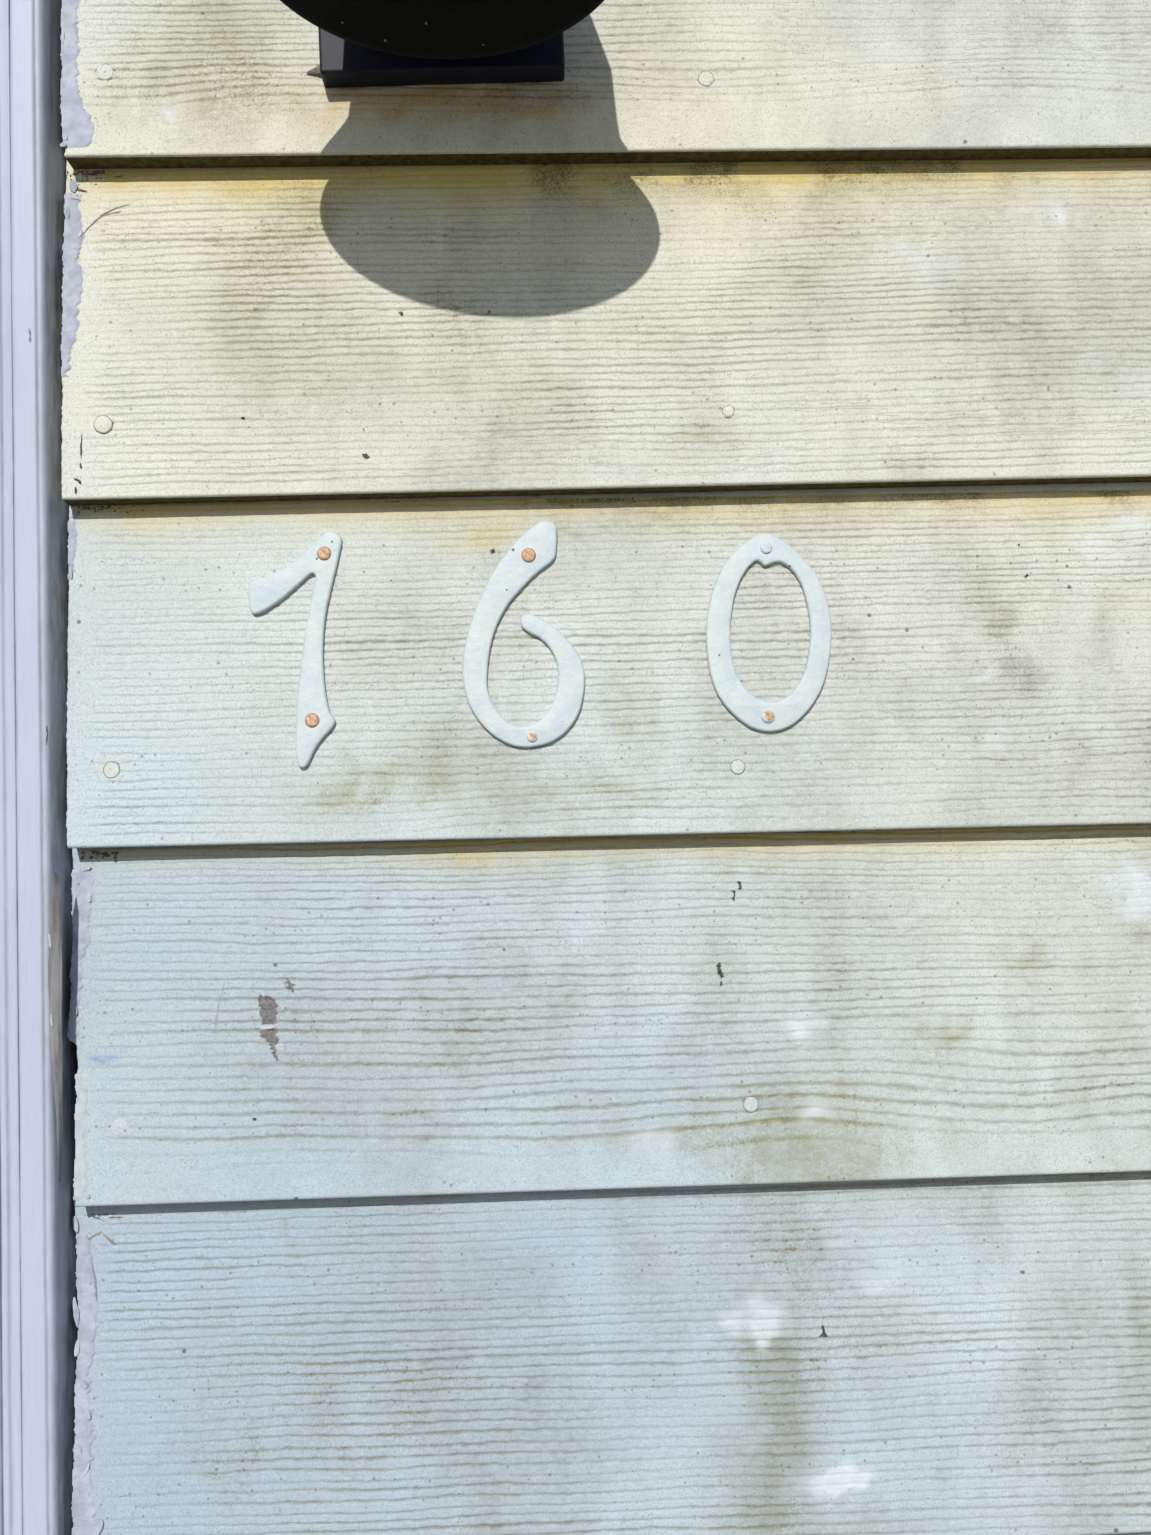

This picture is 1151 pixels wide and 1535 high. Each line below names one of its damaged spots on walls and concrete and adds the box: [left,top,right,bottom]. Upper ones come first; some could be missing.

water stain [66,0,1151,876]
peeling [258,978,317,1061]